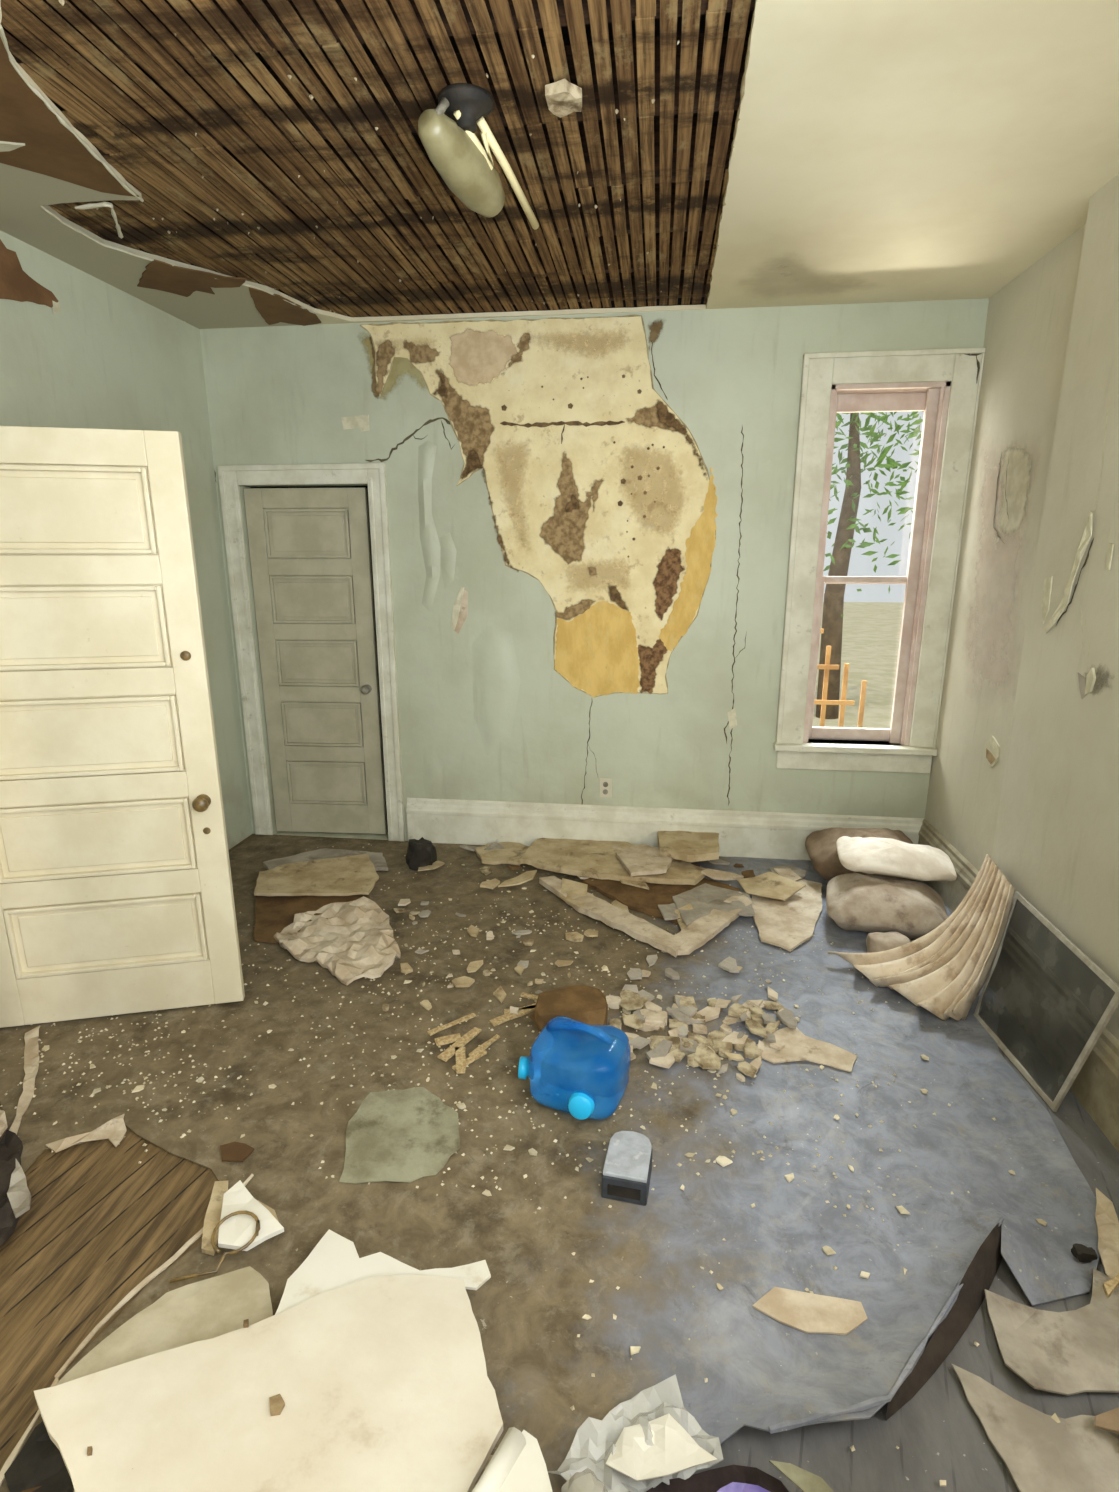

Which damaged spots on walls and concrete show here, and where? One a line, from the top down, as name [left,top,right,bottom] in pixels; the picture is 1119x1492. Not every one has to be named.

flaking render [0,0,755,698]
crack [366,417,454,462]
crack [724,426,747,805]
peeling [1041,400,1114,633]